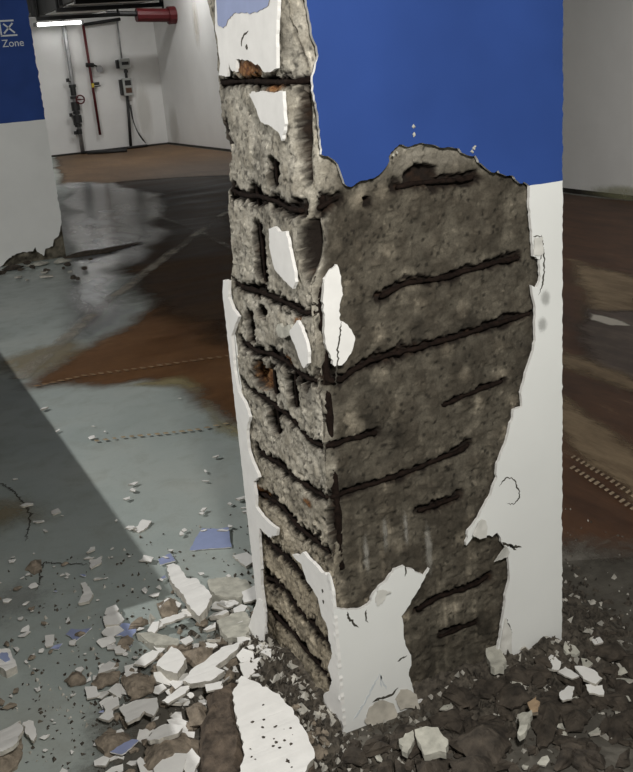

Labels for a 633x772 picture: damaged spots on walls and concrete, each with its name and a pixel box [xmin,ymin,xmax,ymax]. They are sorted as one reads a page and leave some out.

rust [238,60,261,77]
spalling [2,227,66,266]
crack [533,235,545,294]
spalling [207,0,538,725]
crack [500,477,520,505]
crack [0,483,33,541]
spalling [133,519,152,533]
crack [35,561,85,591]
spalling [159,612,185,626]
spalling [548,655,561,672]
spalling [119,641,261,725]